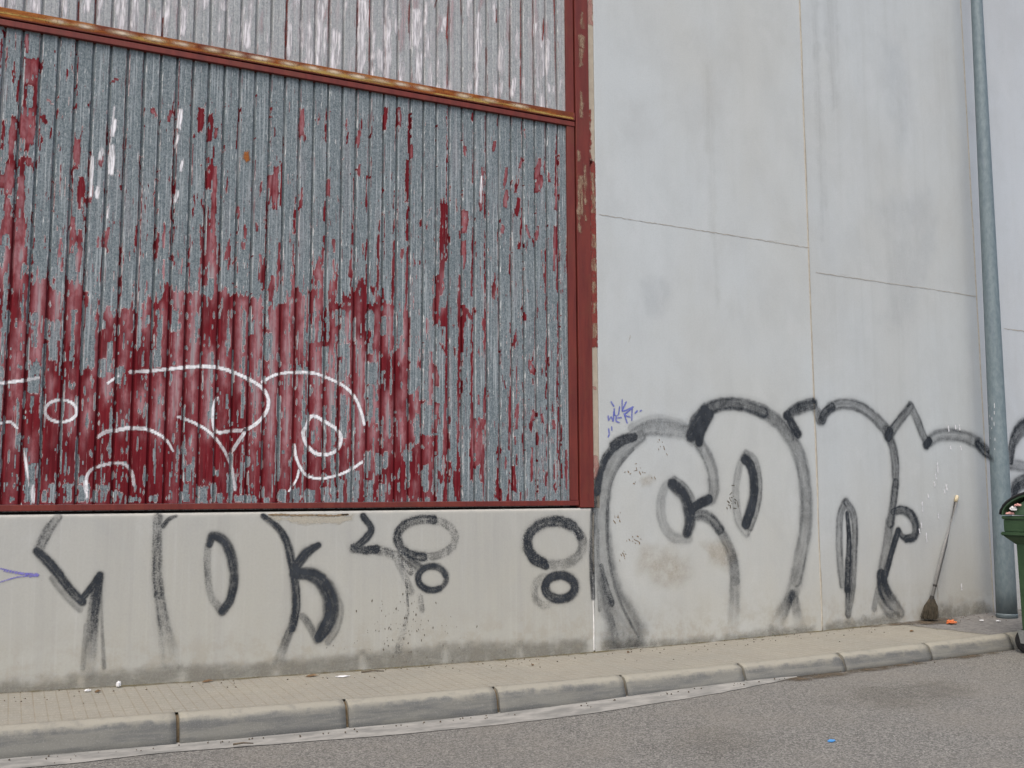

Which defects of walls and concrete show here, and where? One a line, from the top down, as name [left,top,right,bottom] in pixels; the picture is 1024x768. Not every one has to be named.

peeling [30,0,40,14]
peeling [61,0,186,37]
peeling [218,1,252,48]
peeling [266,0,561,107]
peeling [579,0,593,66]
peeling [577,92,598,347]
peeling [0,30,568,524]